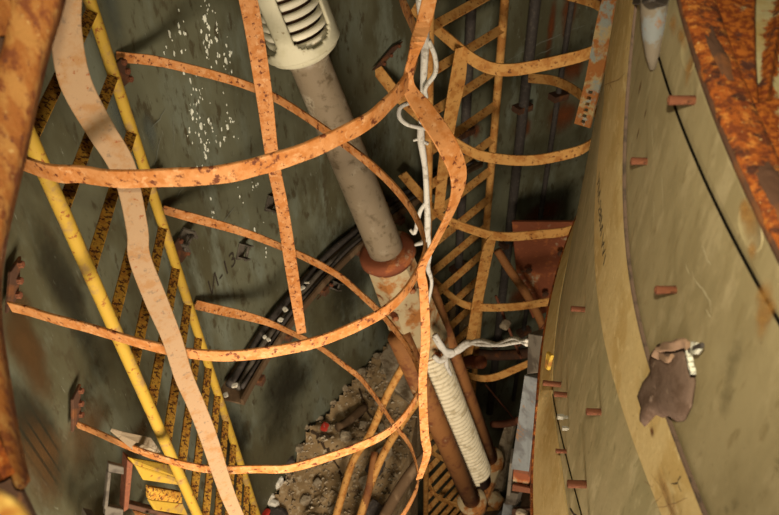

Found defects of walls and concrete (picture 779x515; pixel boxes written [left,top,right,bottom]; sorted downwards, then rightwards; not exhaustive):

rust [705,25,734,81]
damp [111,103,123,130]
rust [756,161,779,221]